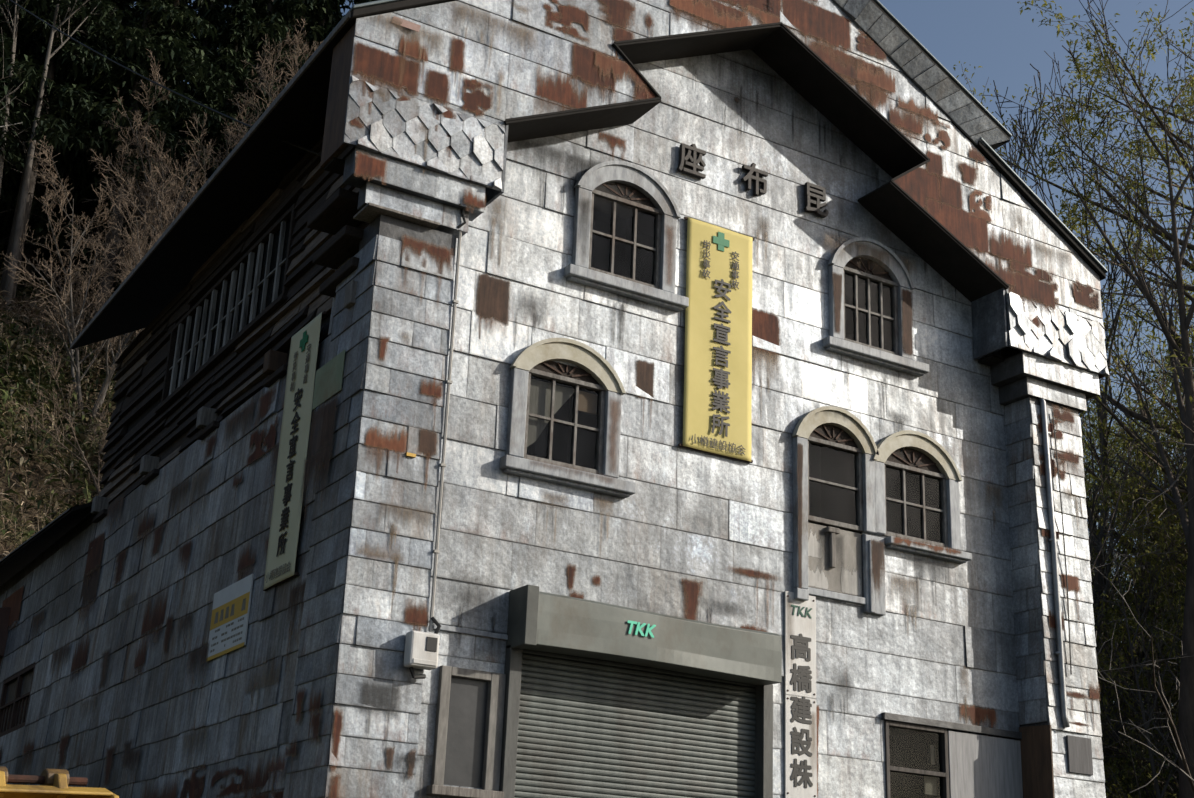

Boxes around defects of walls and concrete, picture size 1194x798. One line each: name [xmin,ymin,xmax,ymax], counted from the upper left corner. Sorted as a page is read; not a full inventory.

rust [350,35,465,157]
rust [536,0,656,110]
rust [670,0,938,141]
rust [599,131,626,161]
rust [894,147,1055,340]
rust [476,273,511,339]
rust [752,308,781,379]
rust [636,360,654,424]
rust [365,378,442,488]
rust [1055,451,1079,466]
rust [567,564,584,599]
rust [682,579,703,620]